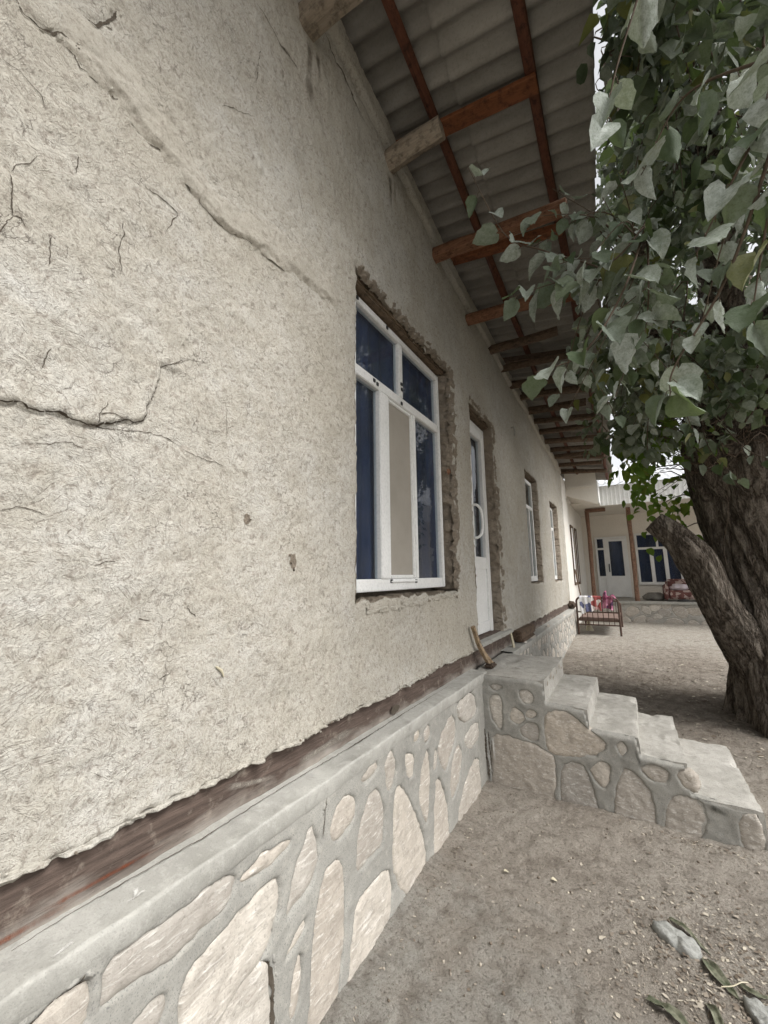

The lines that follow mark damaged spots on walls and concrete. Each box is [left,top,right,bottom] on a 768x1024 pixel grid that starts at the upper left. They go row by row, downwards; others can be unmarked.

crack [17,1,122,72]
crack [0,157,37,231]
crack [146,187,252,244]
crack [0,359,221,465]
crack [263,954,278,1024]